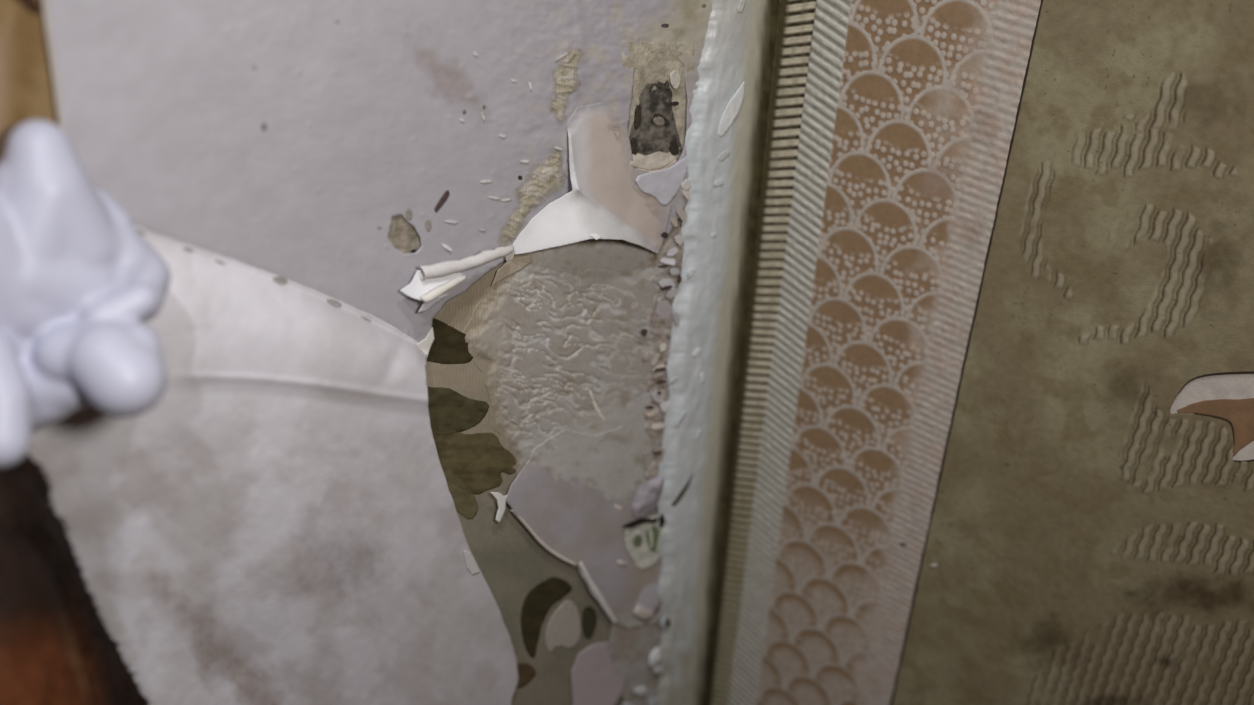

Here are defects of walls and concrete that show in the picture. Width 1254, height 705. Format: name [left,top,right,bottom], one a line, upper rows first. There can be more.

peeling [551,49,581,122]
peeling [718,81,745,161]
peeling [377,190,458,253]
peeling [478,146,565,247]
flaking render [617,24,696,569]
flaking render [633,583,671,630]
flaking render [649,647,665,675]